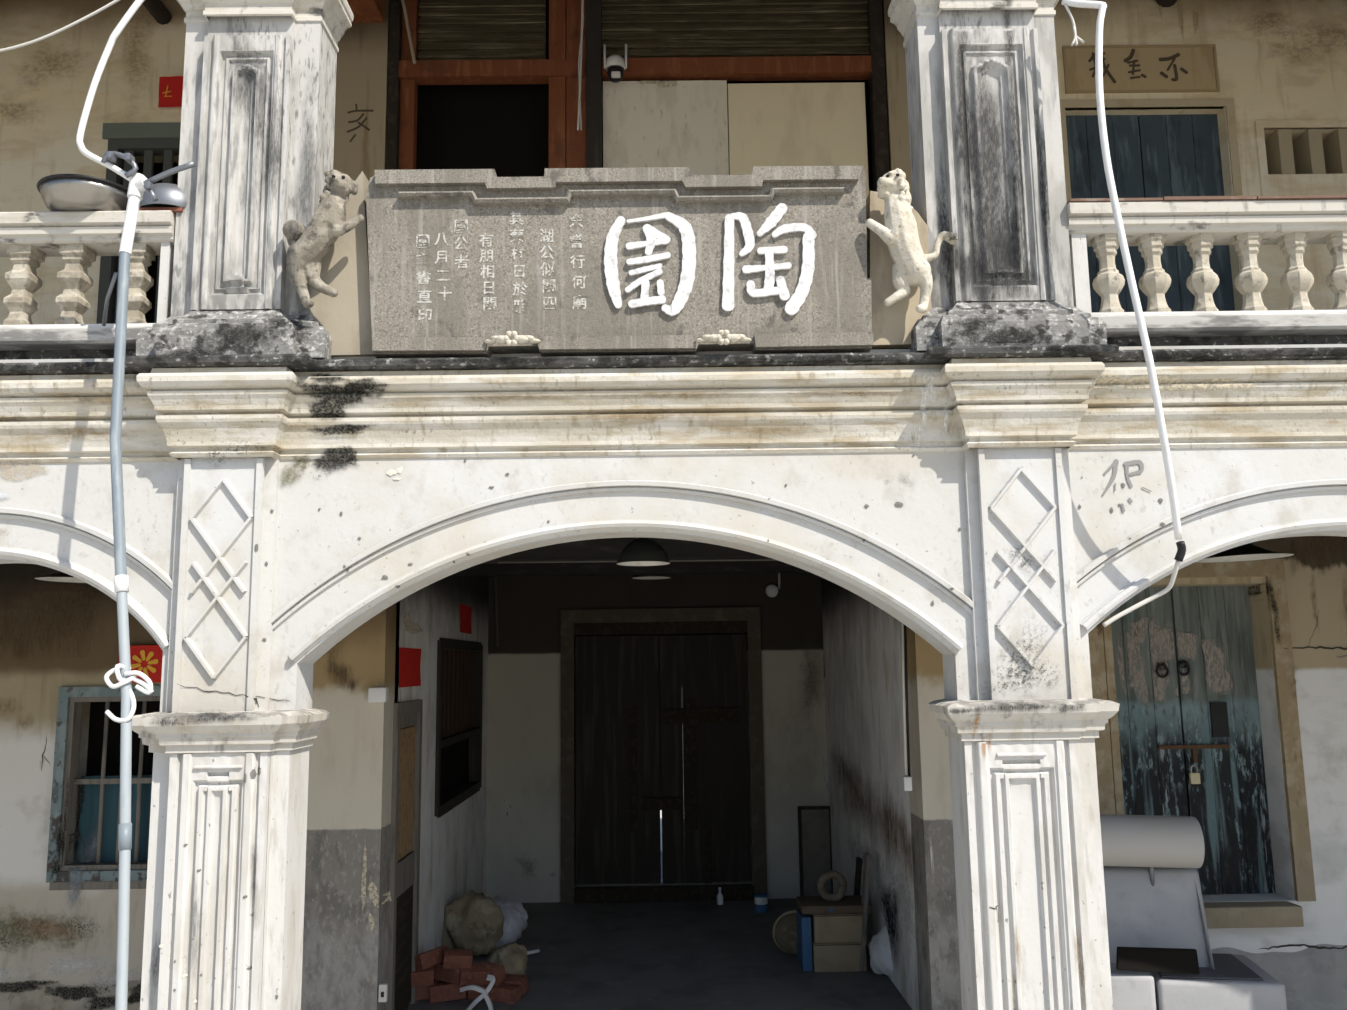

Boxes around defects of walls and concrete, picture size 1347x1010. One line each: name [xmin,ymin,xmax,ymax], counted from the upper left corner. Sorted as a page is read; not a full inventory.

leakage [937,2,1029,304]
leakage [1036,110,1051,257]
mould [302,373,387,477]
crack [1284,609,1347,658]